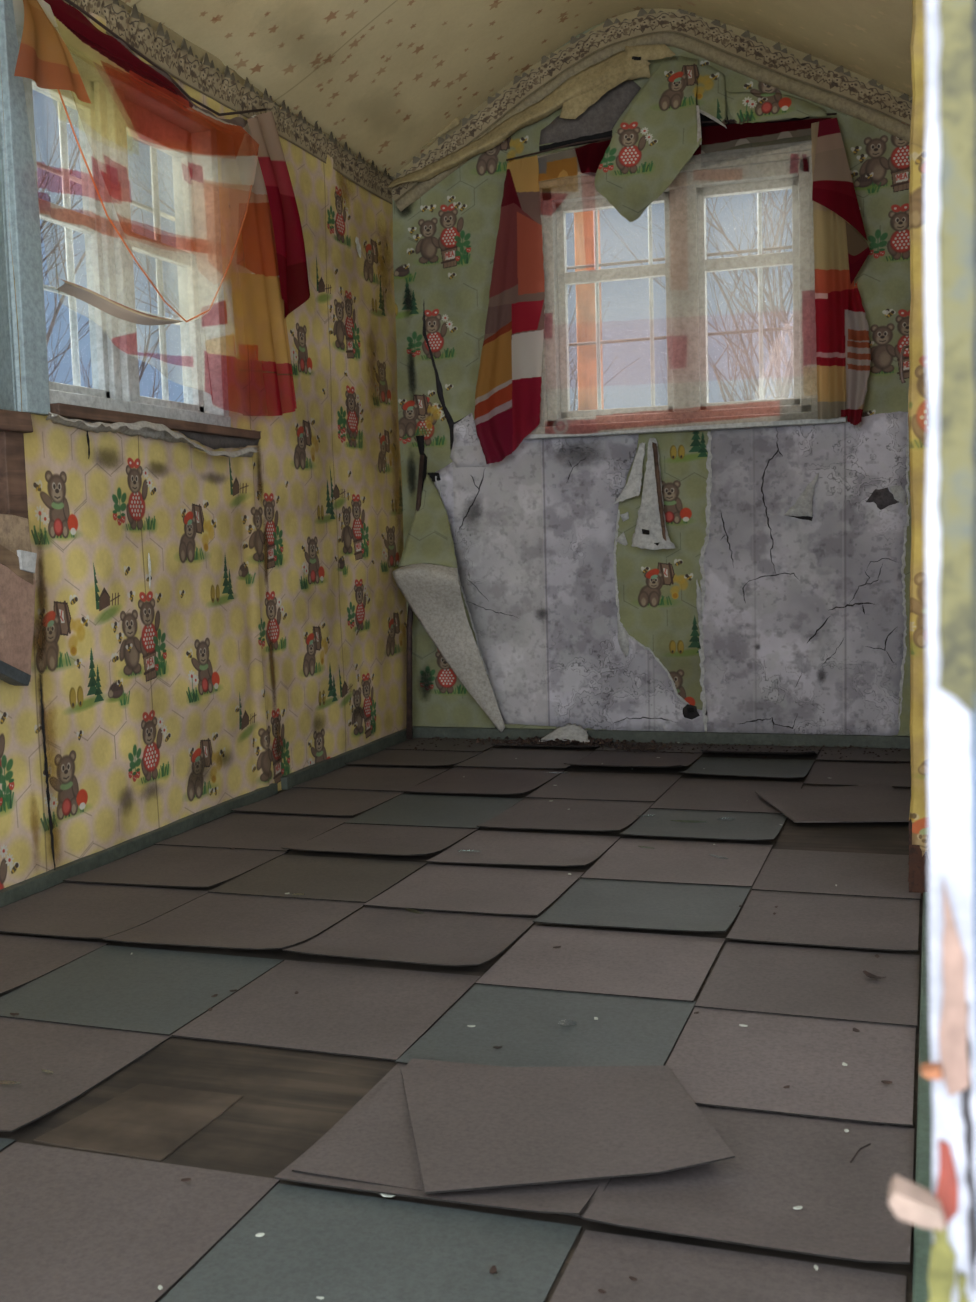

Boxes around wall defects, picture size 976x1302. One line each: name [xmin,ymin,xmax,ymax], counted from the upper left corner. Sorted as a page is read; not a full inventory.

peeling [539,80,641,145]
spalling [0,431,37,579]
peeling [434,411,910,736]
crack [720,431,796,603]
crack [740,558,898,729]
peeling [939,879,970,1097]
peeling [936,1139,958,1226]